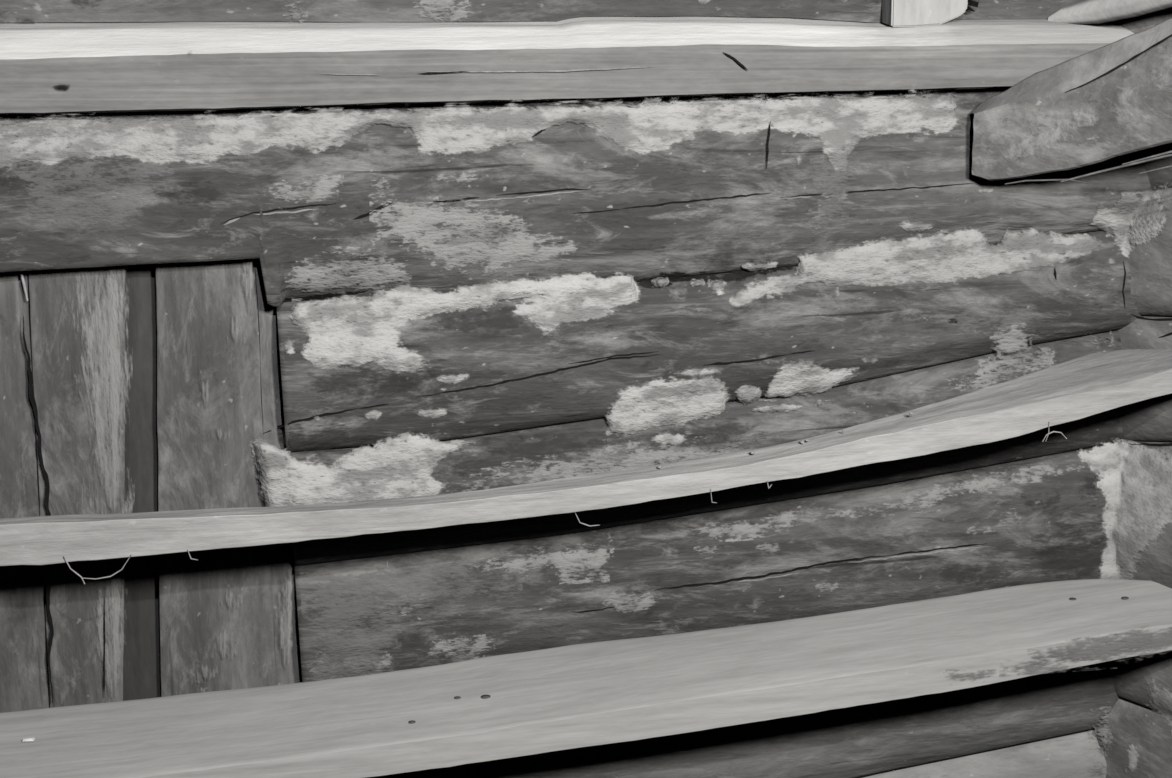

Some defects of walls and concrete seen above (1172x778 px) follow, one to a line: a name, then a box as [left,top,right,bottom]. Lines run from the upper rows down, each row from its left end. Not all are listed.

crack [23,316,51,516]
crack [417,351,659,397]
crack [708,350,815,365]
crack [46,564,54,703]